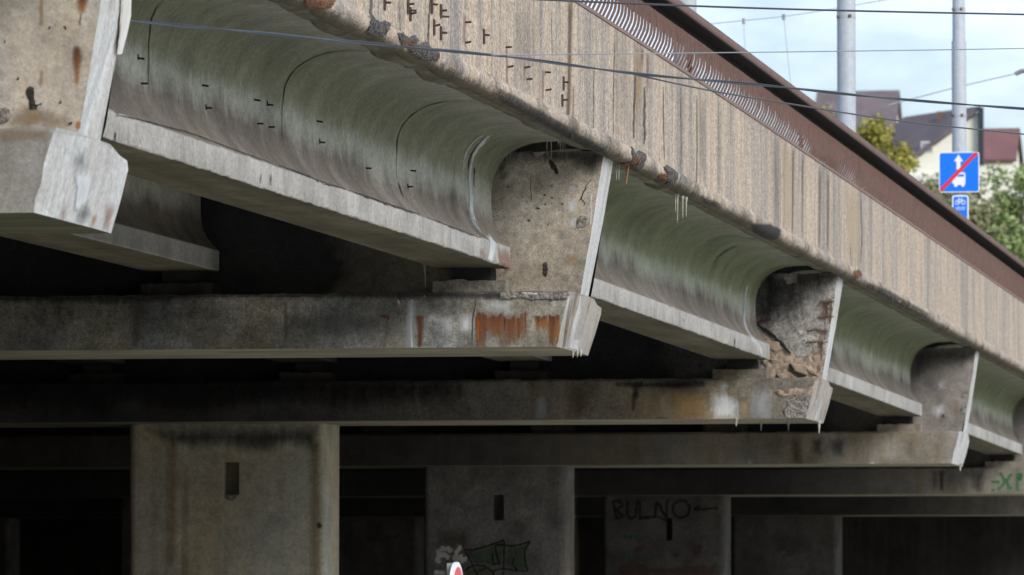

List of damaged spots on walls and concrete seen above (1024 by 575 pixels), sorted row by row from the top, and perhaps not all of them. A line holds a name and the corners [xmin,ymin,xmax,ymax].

spalling [367,15,441,61]
spalling [619,147,647,171]
spalling [658,165,679,186]
corrosion [476,303,572,346]
spalling [757,299,835,418]
leakage [715,385,746,418]